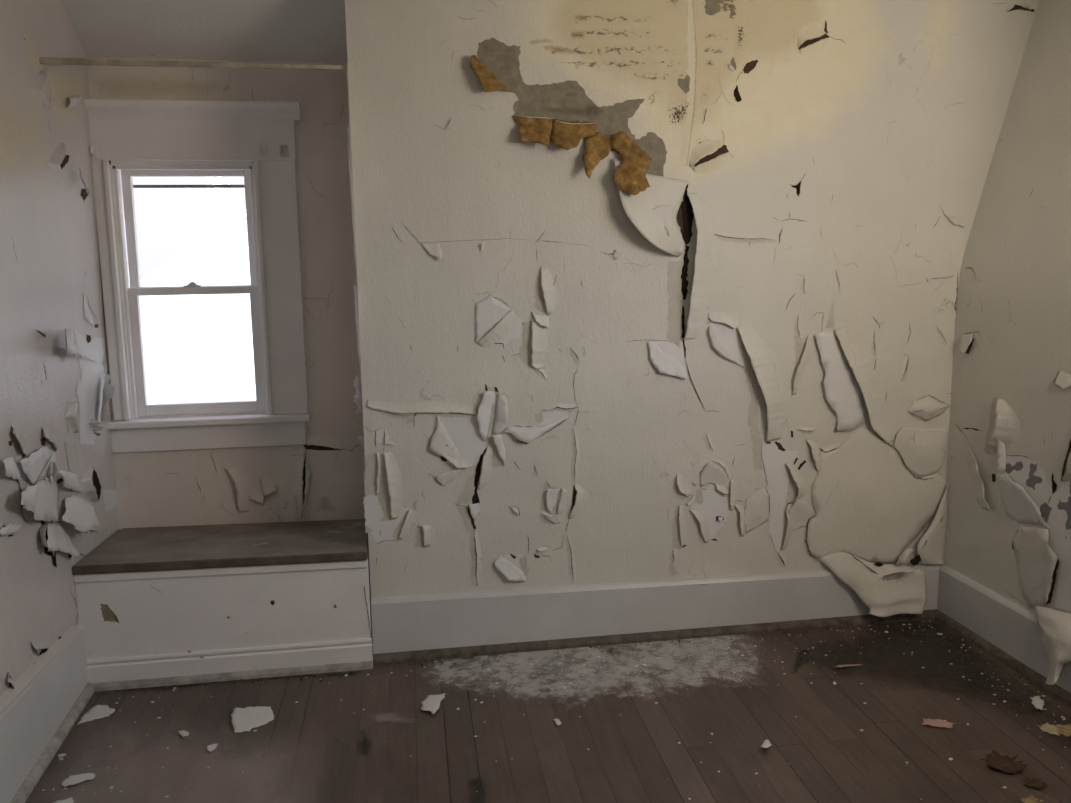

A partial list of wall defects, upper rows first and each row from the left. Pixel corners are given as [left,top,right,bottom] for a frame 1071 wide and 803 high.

spalling [705,0,724,16]
spalling [470,37,687,257]
damp [490,0,984,203]
peeling [471,295,547,348]
spalling [0,295,116,568]
peeling [428,402,579,486]
peeling [494,533,565,582]
peeling [744,431,814,551]
peeling [814,302,949,478]
peeling [819,482,950,617]
spalling [966,438,1071,685]
peeling [1030,695,1044,710]